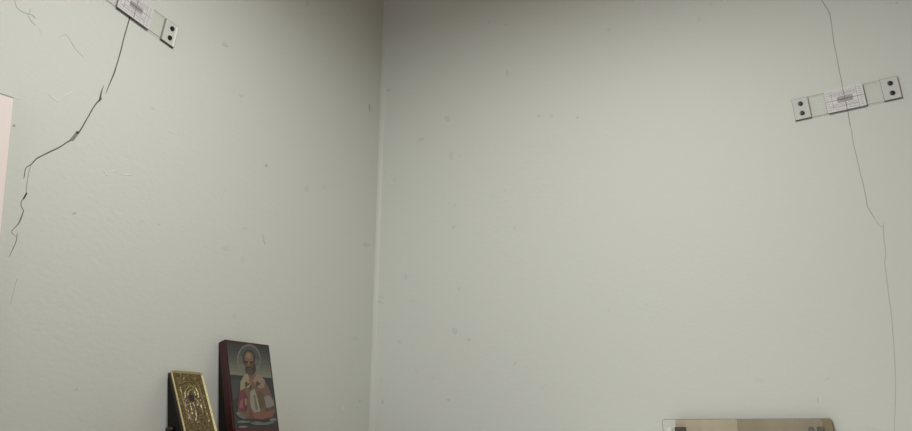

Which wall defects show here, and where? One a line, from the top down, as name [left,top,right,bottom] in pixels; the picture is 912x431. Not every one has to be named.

crack [9,17,130,257]
crack [821,0,843,88]
crack [847,110,896,431]